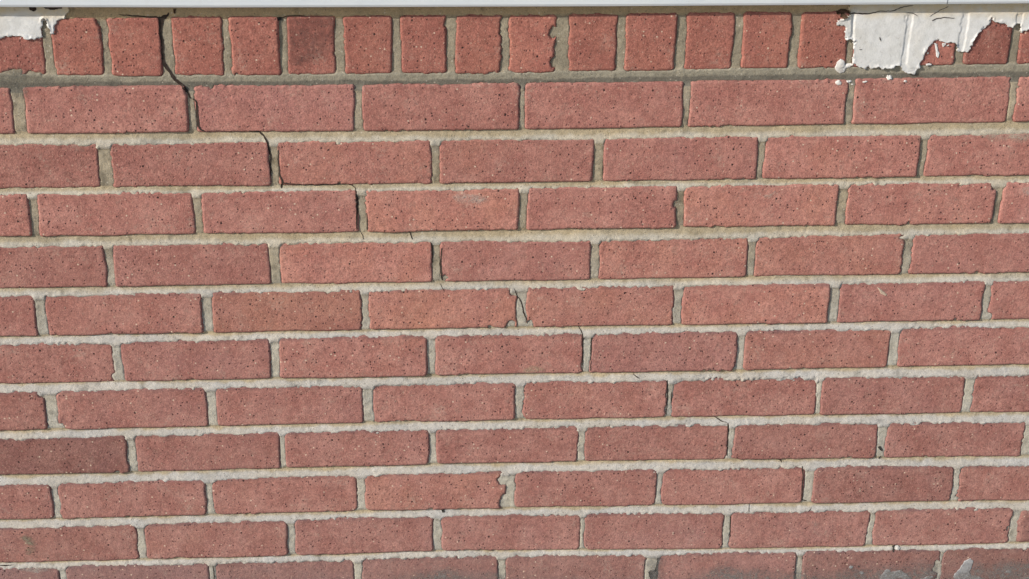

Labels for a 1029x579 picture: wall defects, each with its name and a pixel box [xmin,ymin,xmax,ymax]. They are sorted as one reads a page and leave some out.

peeling [0,7,70,40]
peeling [837,4,1029,75]
crack [119,13,368,239]
crack [409,232,444,290]
crack [578,326,592,371]
crack [778,459,812,512]